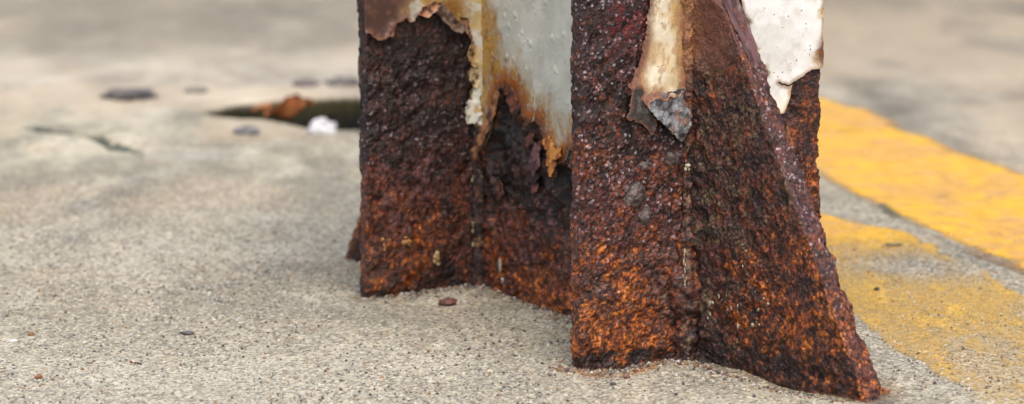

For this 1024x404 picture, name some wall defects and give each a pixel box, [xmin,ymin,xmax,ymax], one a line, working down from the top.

peeling [365,0,520,160]
corrosion [628,0,663,109]
peeling [626,0,693,141]
corrosion [672,0,694,97]
peeling [722,0,824,114]
corrosion [813,41,824,66]
peeling [523,132,557,210]